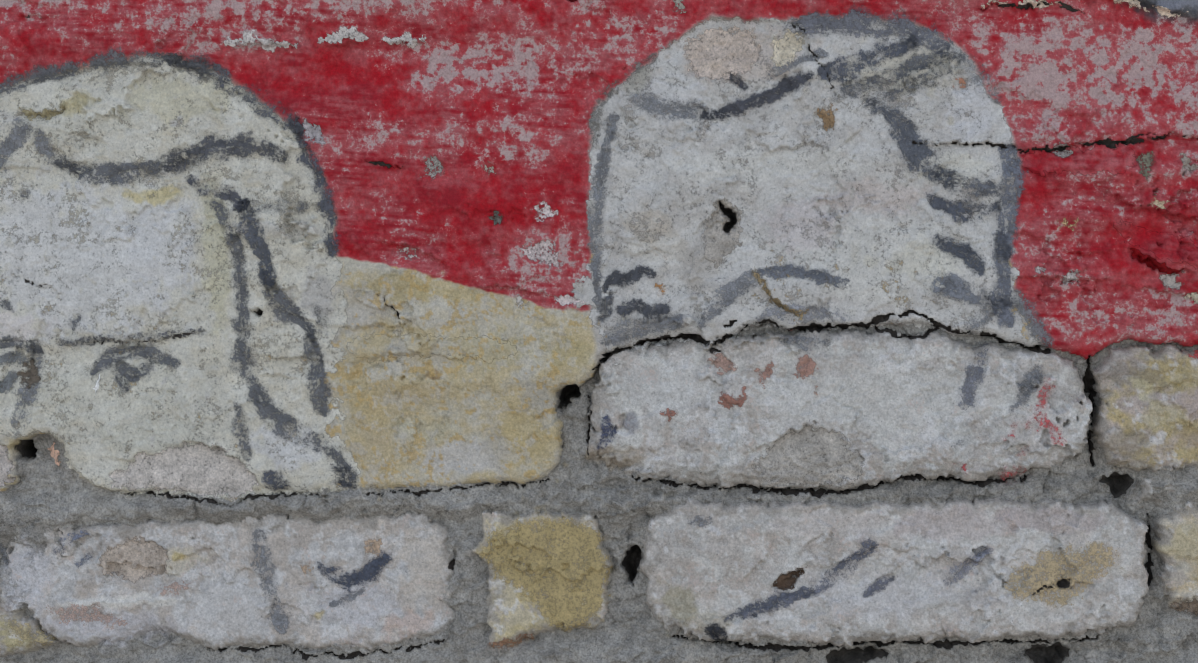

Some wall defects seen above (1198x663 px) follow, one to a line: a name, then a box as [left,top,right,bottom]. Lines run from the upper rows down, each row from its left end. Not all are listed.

peeling [981,0,1060,9]
peeling [1113,0,1189,19]
peeling [224,29,298,53]
peeling [317,26,426,48]
spalling [683,24,805,80]
spalling [19,104,65,121]
spalling [817,103,838,131]
peeling [303,118,325,146]
crack [912,134,1186,154]
peeling [532,201,558,222]
peeling [520,240,563,268]
spalling [108,441,259,502]